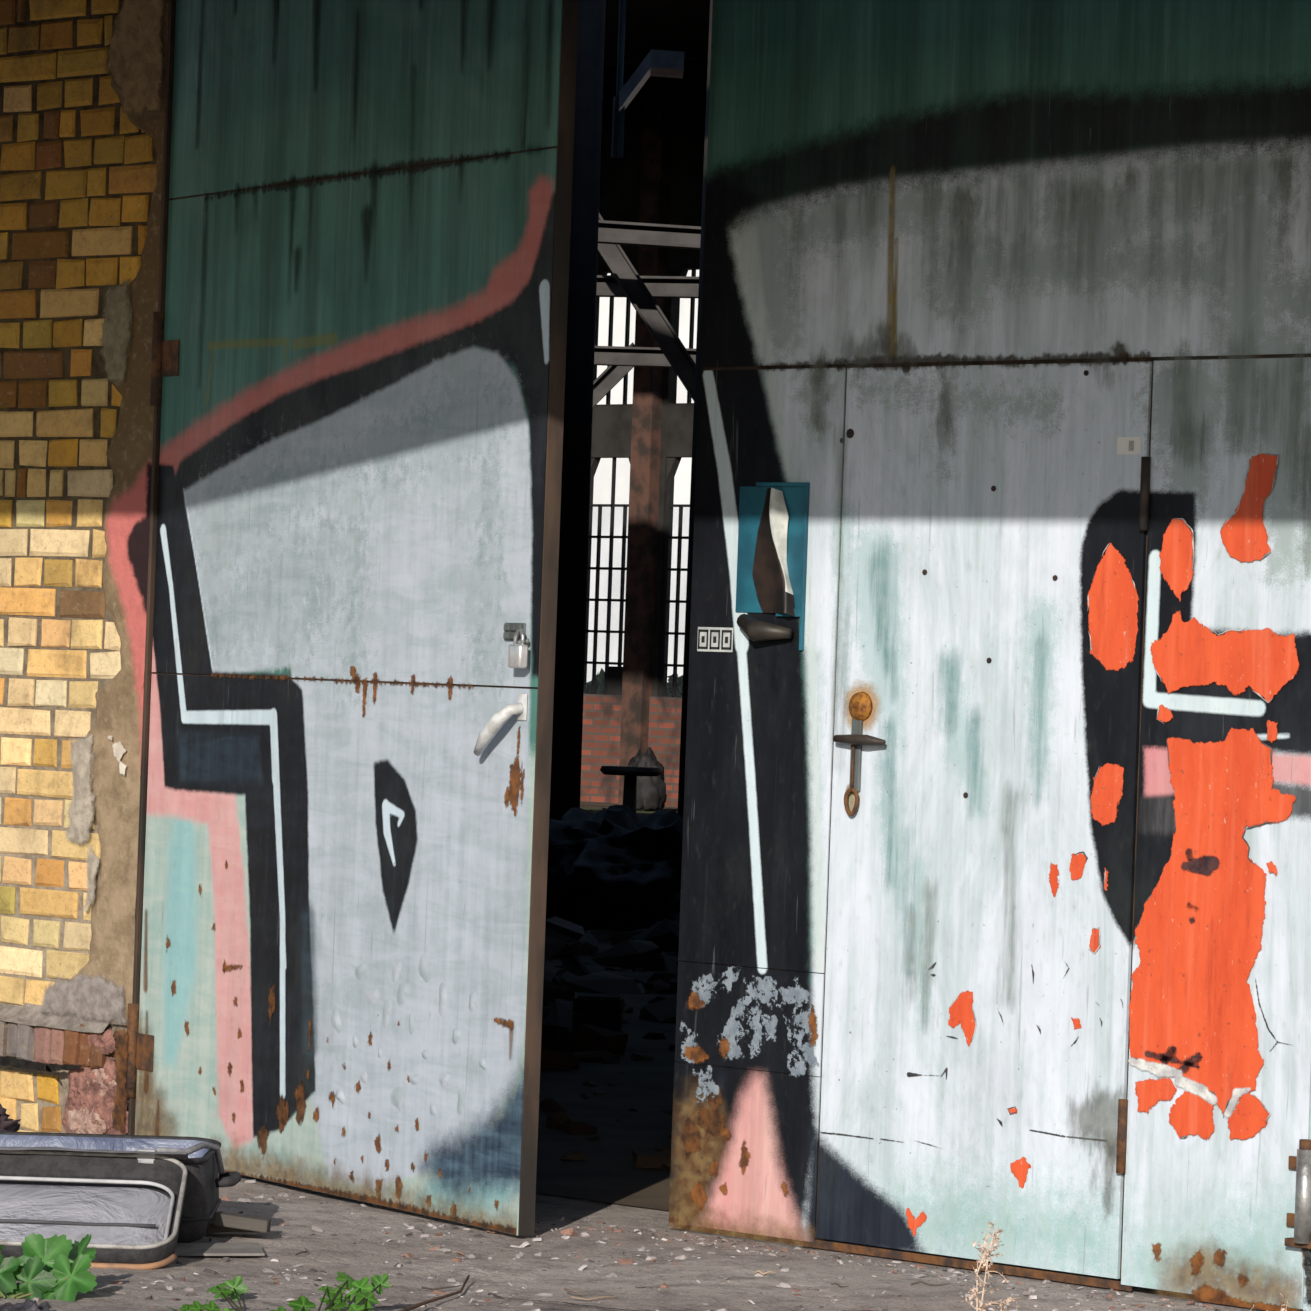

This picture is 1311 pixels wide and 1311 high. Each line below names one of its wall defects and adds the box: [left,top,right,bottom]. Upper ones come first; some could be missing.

rust [760,167,1150,386]
rust [212,666,472,717]
flaking render [66,735,126,912]
rust [504,726,525,816]
peeling [1049,851,1088,897]
peeling [1087,518,1299,1140]
peeling [679,966,819,1103]
peeling [948,990,977,1046]
rust [223,1070,517,1235]
rust [674,1088,763,1240]
peeling [1010,1157,1031,1188]
rust [1173,1248,1311,1311]